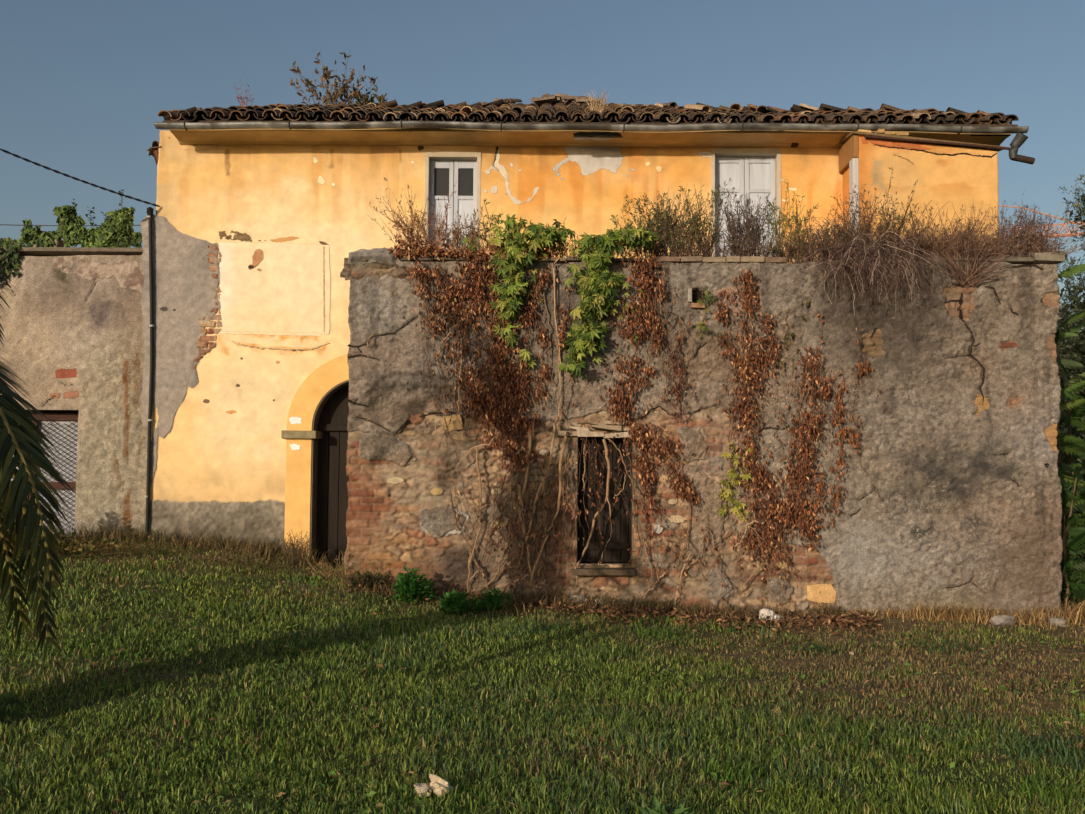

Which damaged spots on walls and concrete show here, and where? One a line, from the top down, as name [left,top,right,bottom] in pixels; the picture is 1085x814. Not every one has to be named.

peeling [483,149,539,205]
crack [874,144,997,165]
peeling [50,157,415,492]
crack [230,247,419,361]
crack [944,263,1043,405]
flaking render [344,402,837,615]